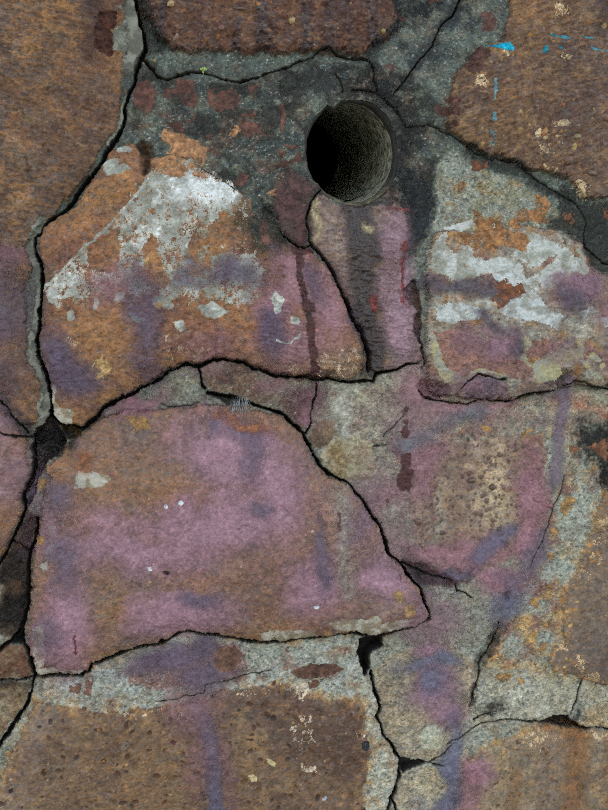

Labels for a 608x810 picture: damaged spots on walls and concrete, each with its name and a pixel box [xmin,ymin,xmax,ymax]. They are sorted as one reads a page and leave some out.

crack [34,0,608,637]
crack [0,400,324,747]
crack [369,669,402,810]
crack [425,623,608,767]